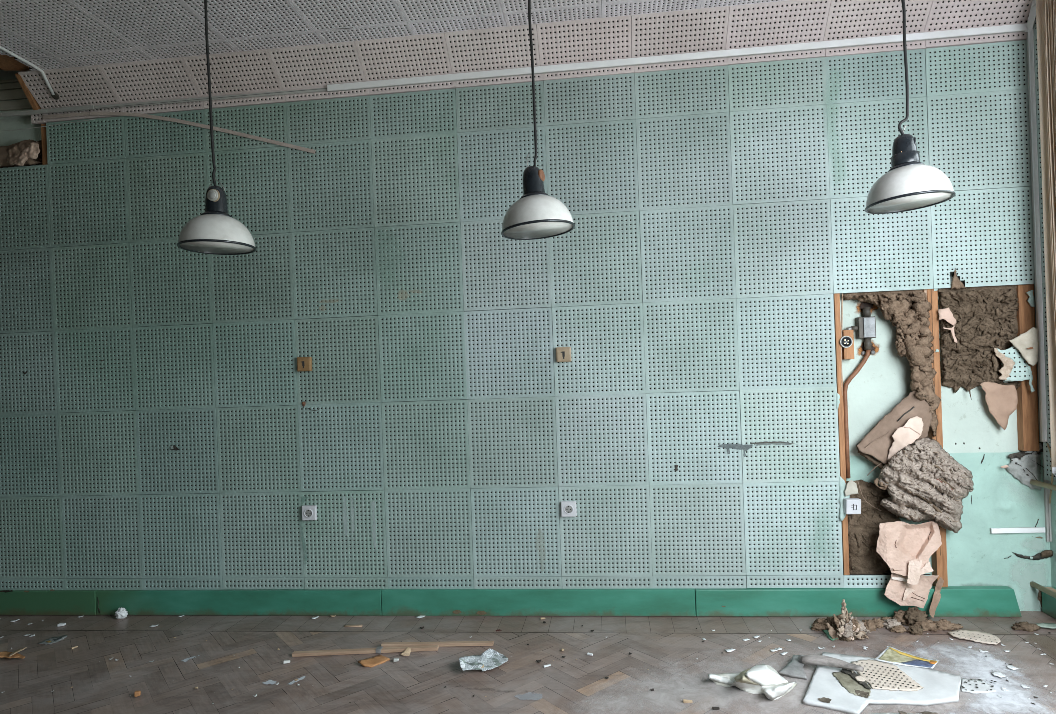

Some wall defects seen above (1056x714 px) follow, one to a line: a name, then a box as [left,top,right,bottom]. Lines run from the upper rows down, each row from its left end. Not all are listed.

flaking render [1001,442,1044,490]